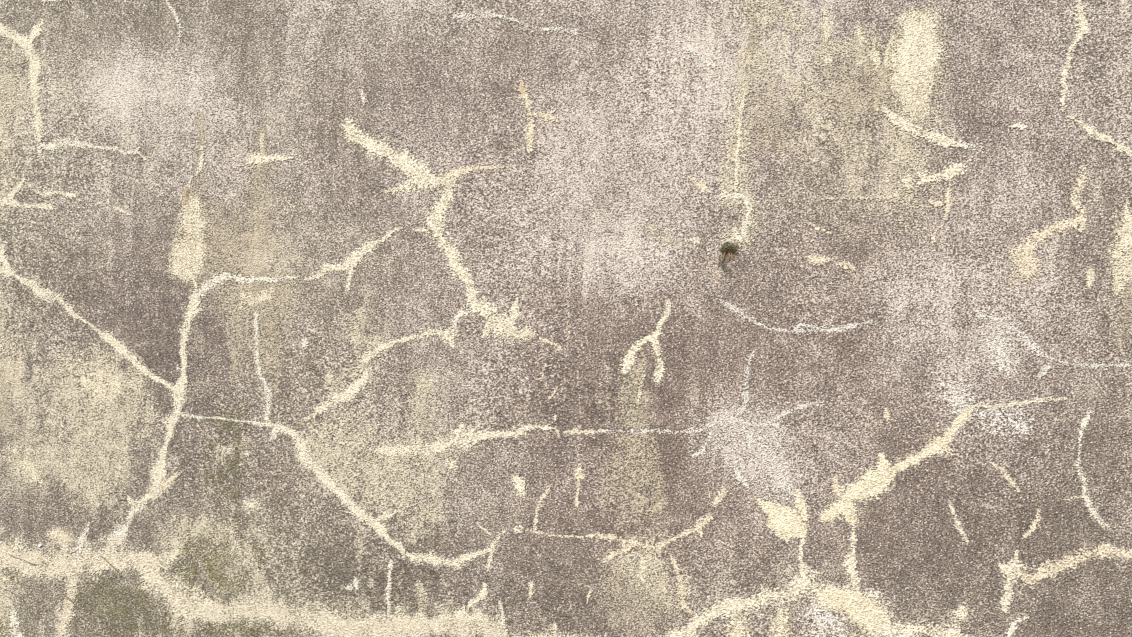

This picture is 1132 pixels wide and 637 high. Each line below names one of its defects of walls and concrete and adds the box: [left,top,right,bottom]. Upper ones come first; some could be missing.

crack [0,0,149,215]
crack [166,0,183,44]
crack [518,77,560,153]
crack [639,79,761,256]
crack [815,106,982,246]
crack [1007,165,1088,286]
crack [1059,0,1132,159]
crack [0,115,820,637]
crack [820,386,1132,637]